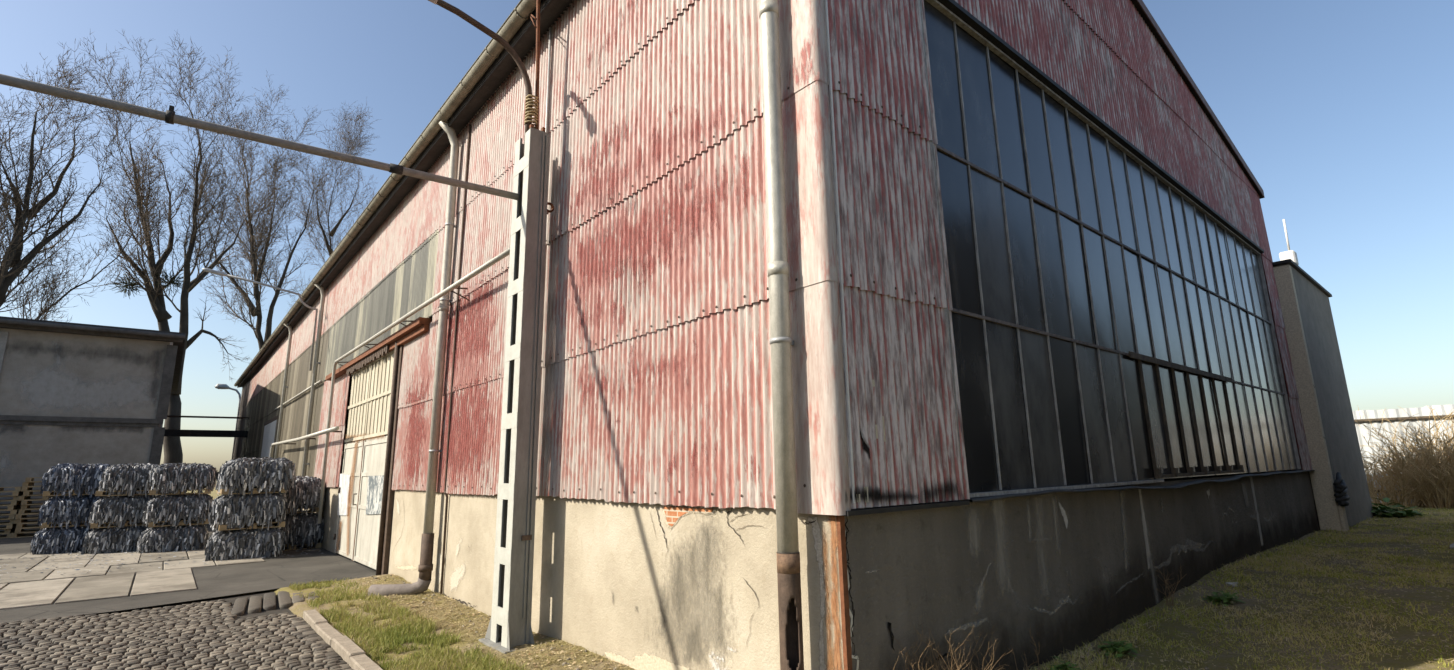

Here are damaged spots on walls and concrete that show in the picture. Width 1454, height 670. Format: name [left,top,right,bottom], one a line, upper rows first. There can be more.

spalling [662,506,716,529]
damp [661,530,734,670]
rust [824,515,842,670]
damp [925,477,1319,670]